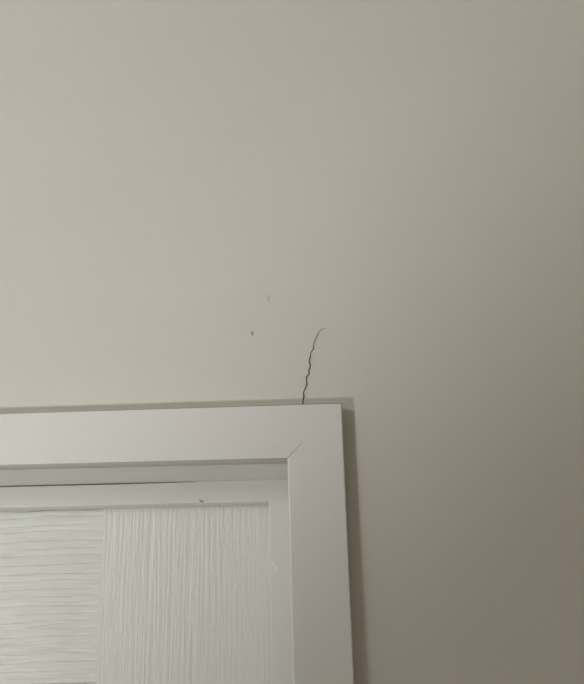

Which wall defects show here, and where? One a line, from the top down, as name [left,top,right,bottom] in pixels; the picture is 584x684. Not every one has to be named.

crack [302,328,326,404]